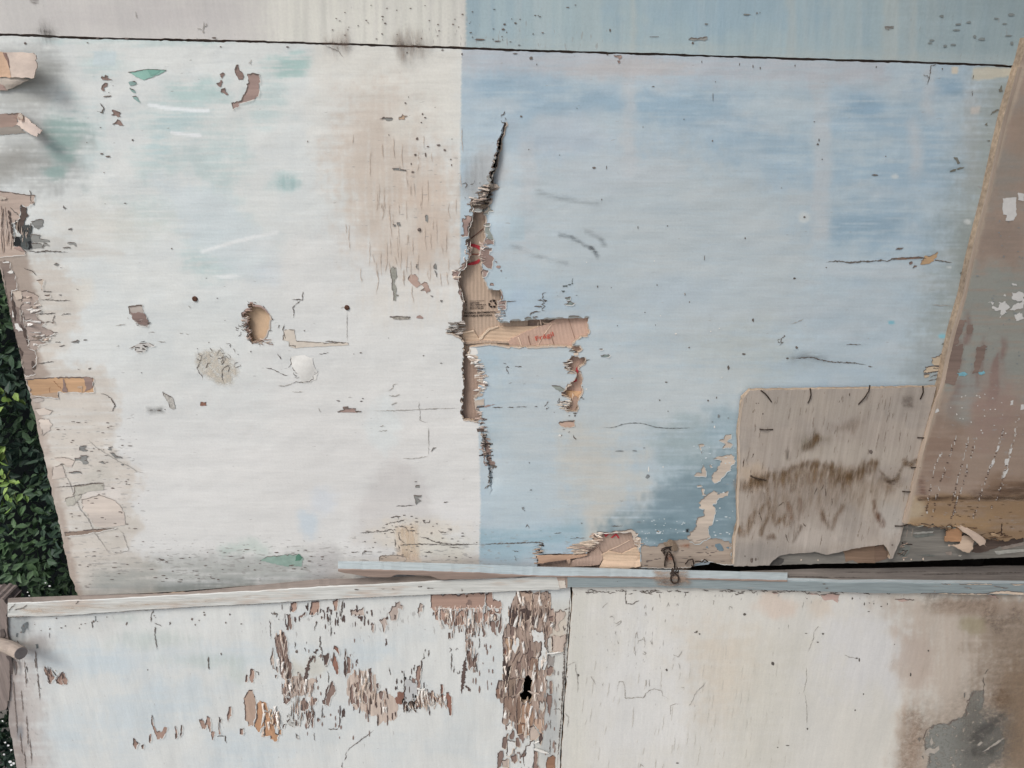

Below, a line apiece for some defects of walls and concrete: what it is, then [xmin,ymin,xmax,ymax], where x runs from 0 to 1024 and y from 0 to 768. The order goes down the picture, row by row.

peeling [216,65,261,110]
peeling [1002,193,1024,221]
peeling [14,219,49,252]
crack [829,256,952,264]
peeling [23,279,62,346]
peeling [988,283,1024,321]
peeling [31,397,52,436]
peeling [687,434,736,545]
peeling [239,599,403,742]
peeling [417,591,553,738]
peeling [133,715,183,750]
peeling [199,707,232,740]